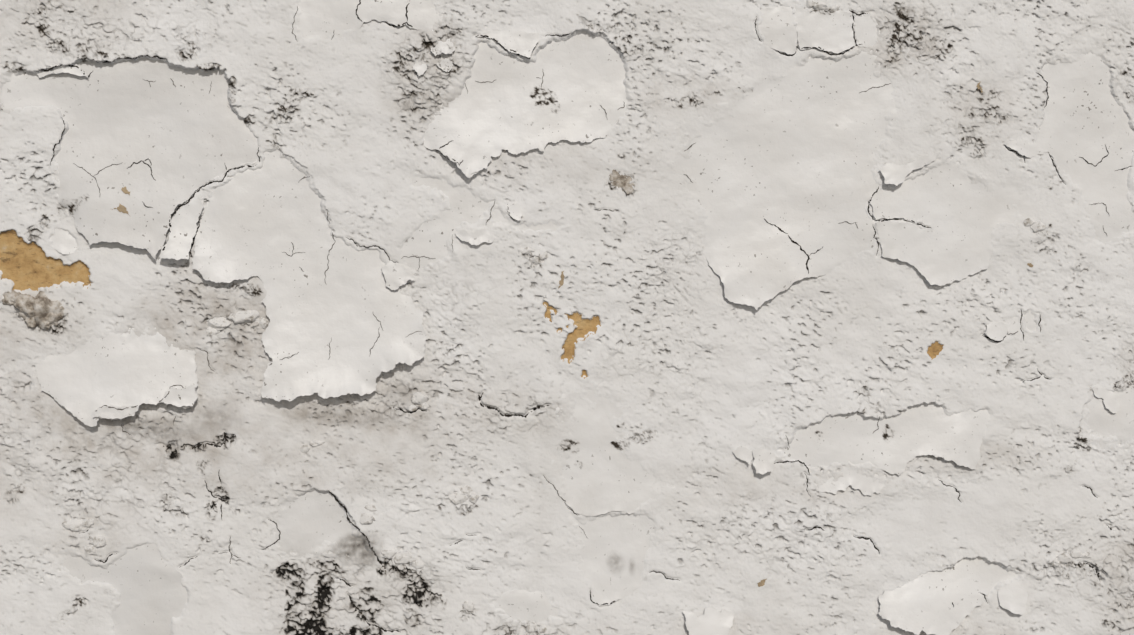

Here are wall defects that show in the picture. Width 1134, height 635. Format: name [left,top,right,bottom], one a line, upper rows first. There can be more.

crack [50,119,260,260]
peeling [0,30,630,402]
crack [838,187,931,255]
peeling [662,6,1134,310]
peeling [35,327,198,427]
peeling [551,370,677,606]
peeling [733,402,990,496]
mould [276,560,384,635]
mould [377,558,443,626]
peeling [878,557,1028,635]